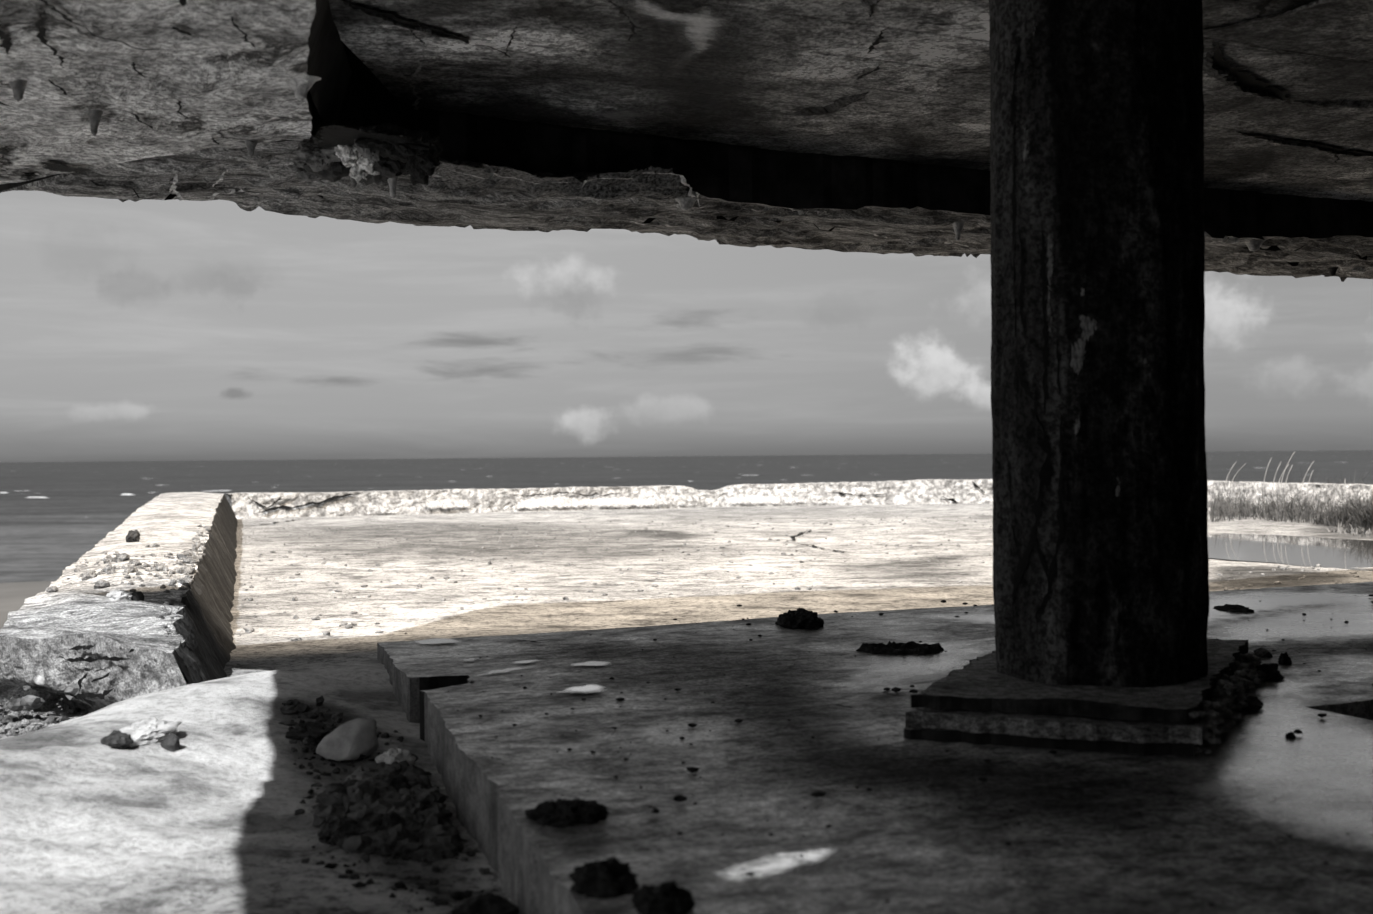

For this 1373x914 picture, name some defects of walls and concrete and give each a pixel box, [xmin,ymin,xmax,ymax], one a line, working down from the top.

crack [341,0,517,58]
crack [786,0,889,117]
crack [1203,0,1373,109]
spalling [0,147,90,183]
peeling [169,167,253,201]
spalling [293,122,700,206]
crack [1237,132,1373,162]